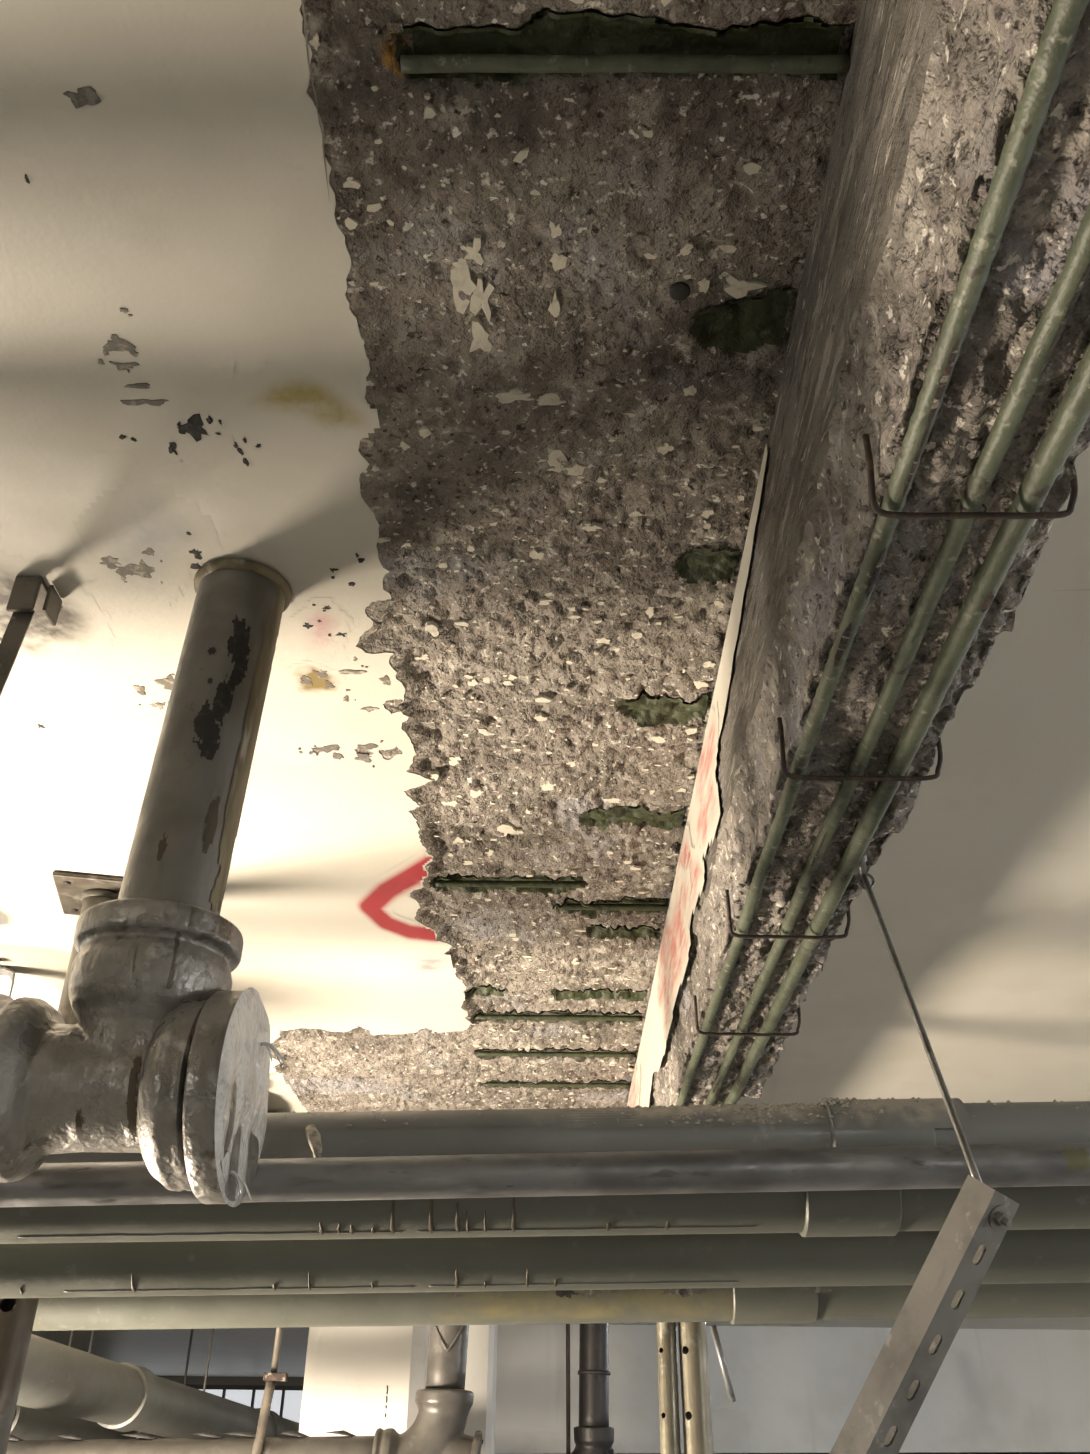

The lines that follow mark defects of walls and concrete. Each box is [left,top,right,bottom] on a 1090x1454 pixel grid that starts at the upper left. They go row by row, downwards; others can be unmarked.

peeling [97,334,169,406]
peeling [168,414,261,466]
peeling [100,548,163,584]
peeling [186,531,202,569]
spalling [270,0,1090,1112]
peeling [132,673,175,710]
peeling [192,614,251,760]